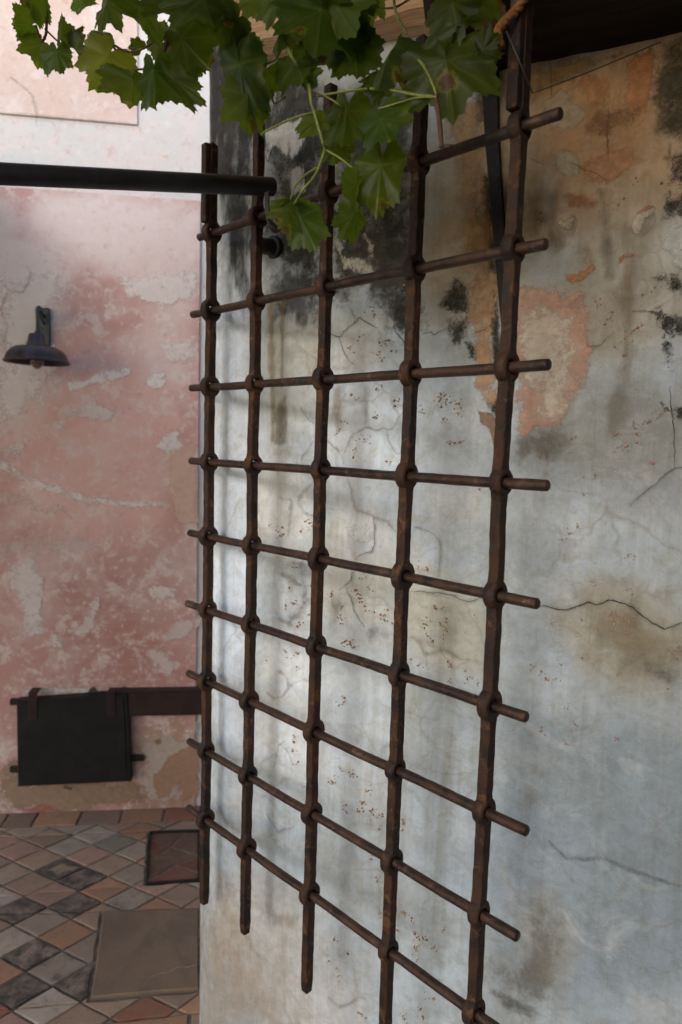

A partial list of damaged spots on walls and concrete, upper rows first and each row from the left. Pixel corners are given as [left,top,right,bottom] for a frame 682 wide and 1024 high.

damp [210,45,252,176]
damp [265,84,322,201]
damp [222,195,251,300]
damp [335,174,409,331]
peeling [0,272,66,350]
peeling [0,363,131,431]
damp [440,281,476,360]
flaking render [468,272,498,445]
flaking render [514,265,613,436]
crack [630,390,682,506]
crack [540,599,682,630]
flaking render [0,722,200,813]